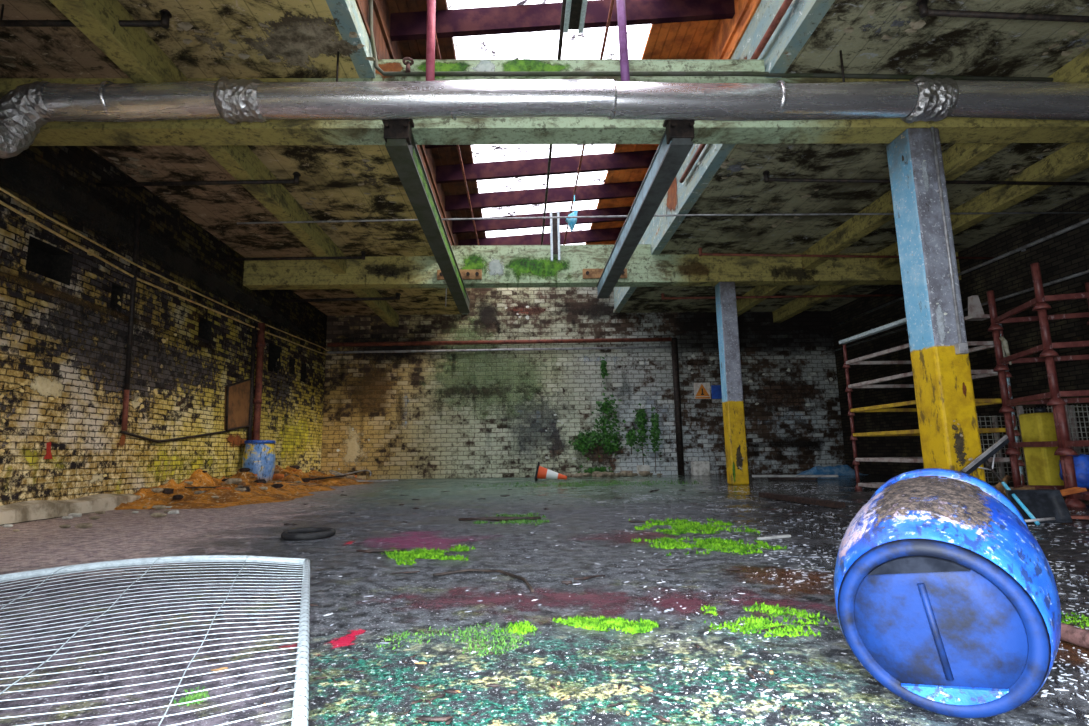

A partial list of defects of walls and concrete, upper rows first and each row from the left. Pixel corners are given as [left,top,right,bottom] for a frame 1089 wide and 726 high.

damp [365,248,409,277]
damp [769,266,818,281]
rust [227,430,253,448]
damp [336,427,370,470]
damp [404,382,565,459]
damp [645,393,667,458]
damp [755,438,823,451]